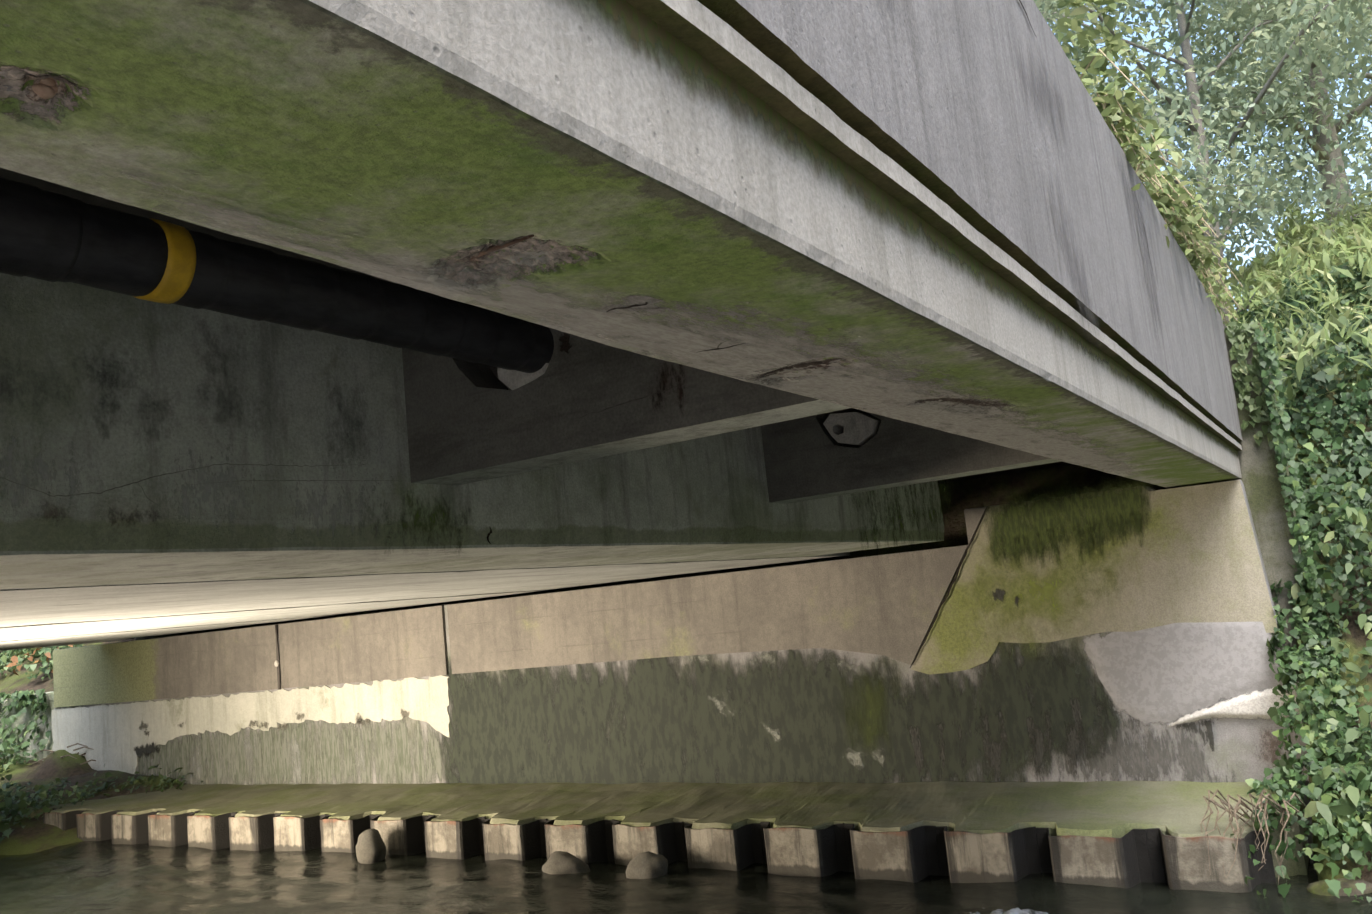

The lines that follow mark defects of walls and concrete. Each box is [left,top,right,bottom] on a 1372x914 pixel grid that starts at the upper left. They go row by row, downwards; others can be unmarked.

spalling [0,65,91,124]
spalling [430,235,597,285]
leakage [134,642,1235,785]